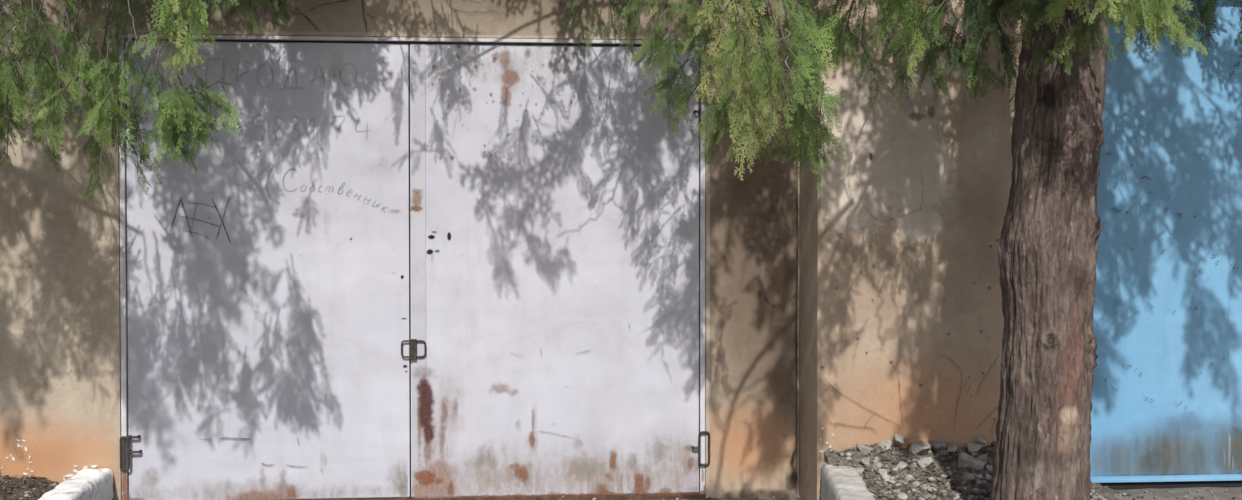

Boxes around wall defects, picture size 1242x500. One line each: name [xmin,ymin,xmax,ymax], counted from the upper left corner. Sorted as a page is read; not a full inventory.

crack [289,0,367,31]
rust [501,55,518,105]
water stain [0,432,105,483]
rust [412,379,706,498]
rust [239,487,295,500]